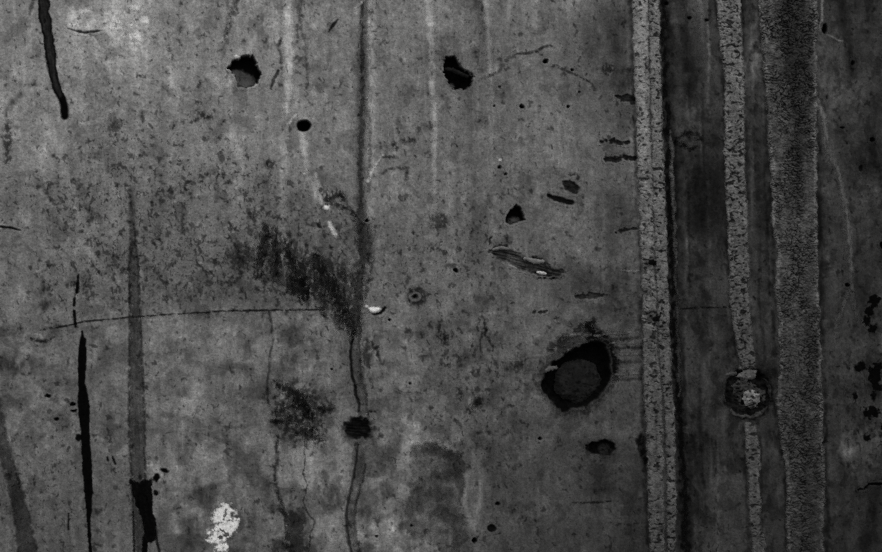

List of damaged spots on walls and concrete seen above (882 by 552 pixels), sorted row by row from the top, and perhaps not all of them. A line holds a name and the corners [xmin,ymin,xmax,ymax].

spalling [216,40,282,93]
spalling [440,53,477,94]
spalling [502,202,528,228]
spalling [483,233,572,280]
crack [347,221,381,417]
peeling [863,294,882,334]
crack [30,309,324,404]
peeling [852,361,882,430]
spalling [583,435,618,459]
crack [342,440,366,552]
crack [855,479,882,493]